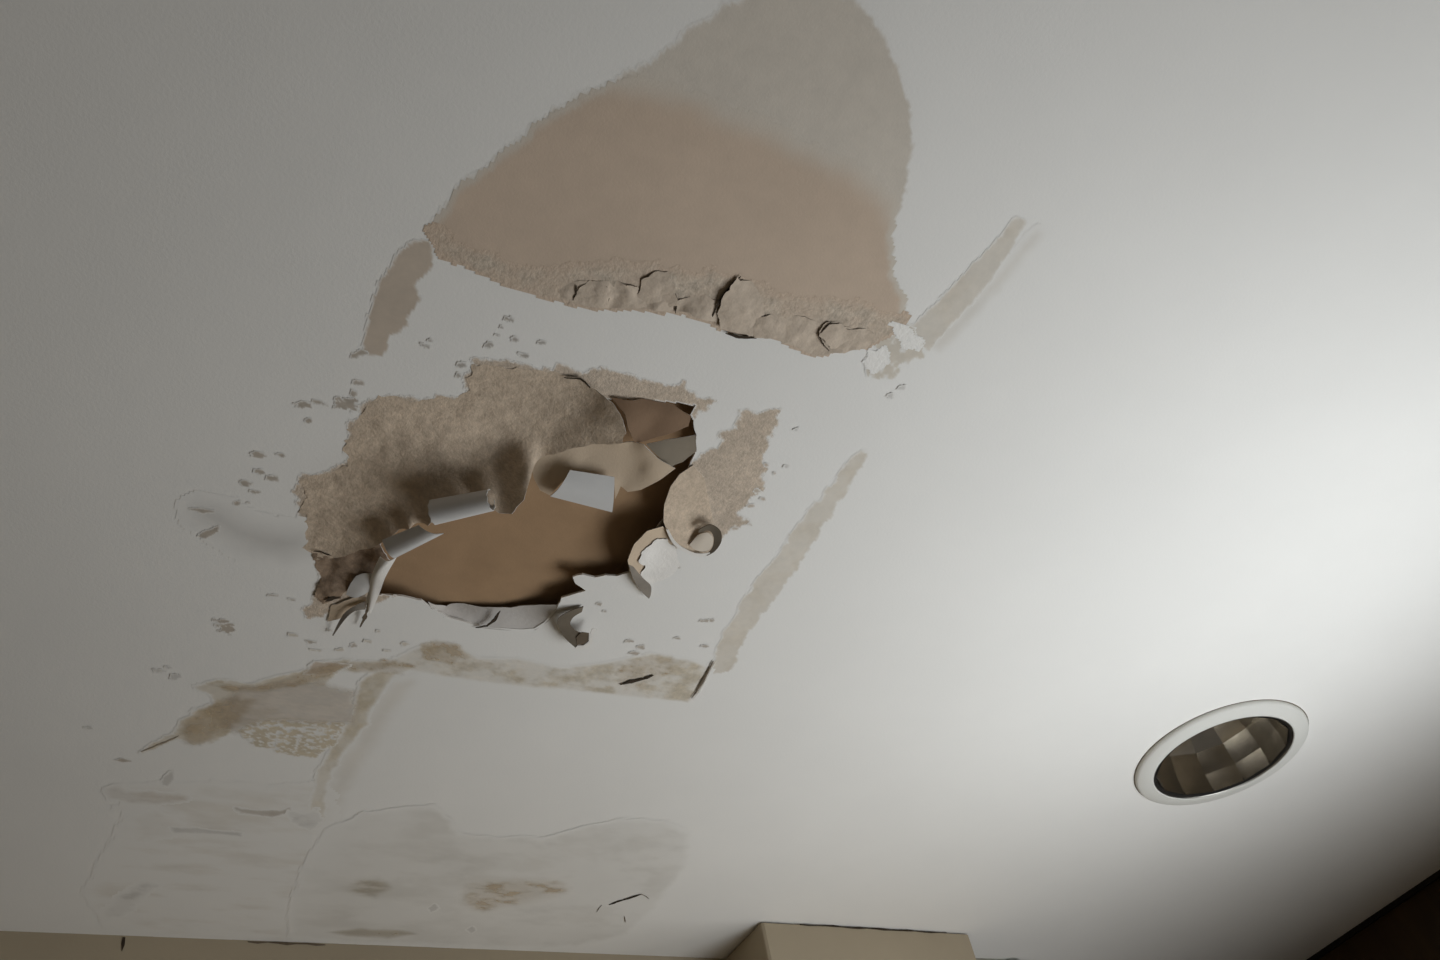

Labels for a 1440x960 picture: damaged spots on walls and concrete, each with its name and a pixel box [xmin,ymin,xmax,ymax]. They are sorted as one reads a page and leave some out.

leakage [423,0,1050,358]
peeling [349,239,435,359]
peeling [483,316,547,359]
peeling [292,379,366,424]
peeling [658,408,799,569]
peeling [211,618,237,636]
peeling [114,628,411,763]